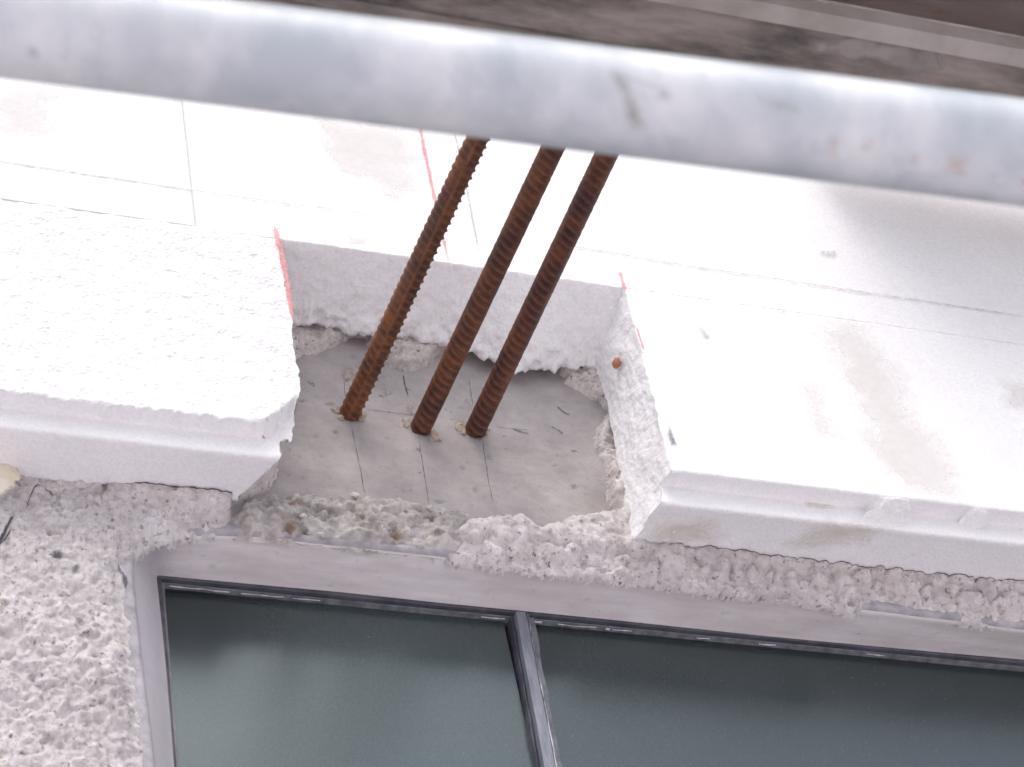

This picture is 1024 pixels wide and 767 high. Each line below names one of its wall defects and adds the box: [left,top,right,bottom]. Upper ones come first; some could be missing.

spalling [292,137,565,435]
spalling [465,153,618,437]
spalling [232,492,469,560]
spalling [557,366,625,511]